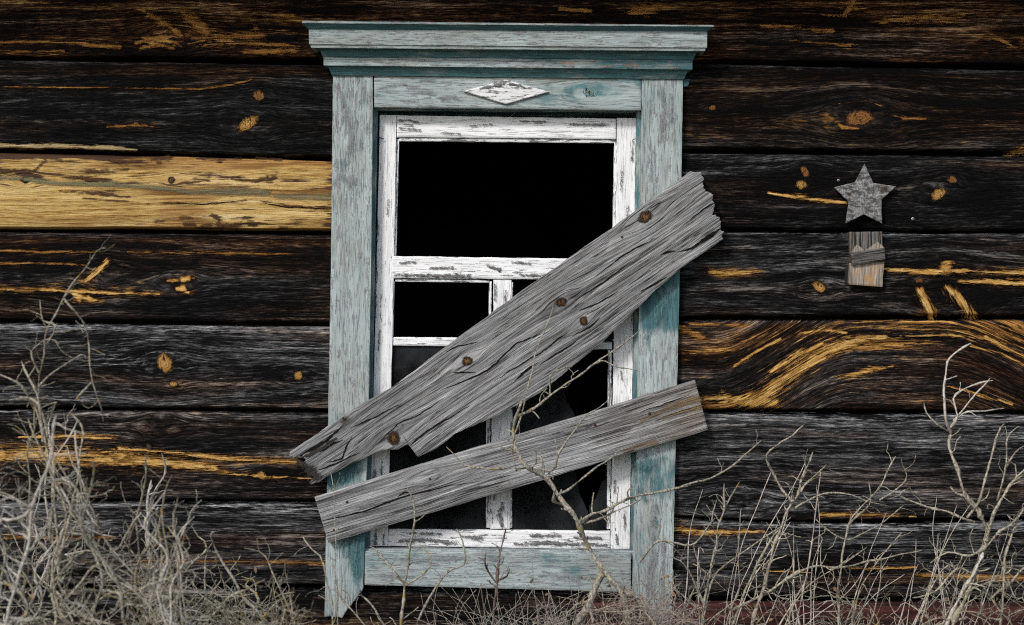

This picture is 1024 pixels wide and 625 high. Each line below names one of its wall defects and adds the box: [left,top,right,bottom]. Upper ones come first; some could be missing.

crack [300,202,722,470]
peeling [398,532,485,561]
peeling [514,513,626,548]